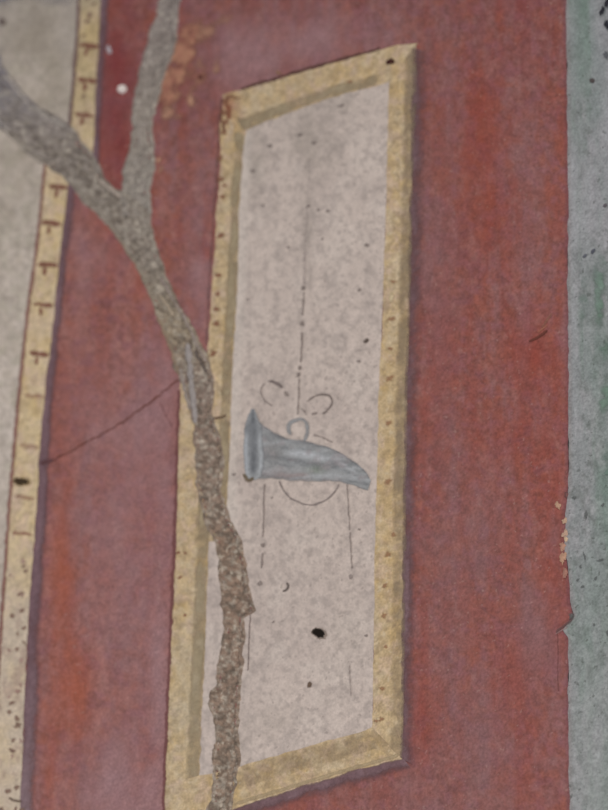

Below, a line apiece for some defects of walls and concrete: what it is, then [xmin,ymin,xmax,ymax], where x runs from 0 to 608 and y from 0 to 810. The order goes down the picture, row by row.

crack [0,0,256,810]